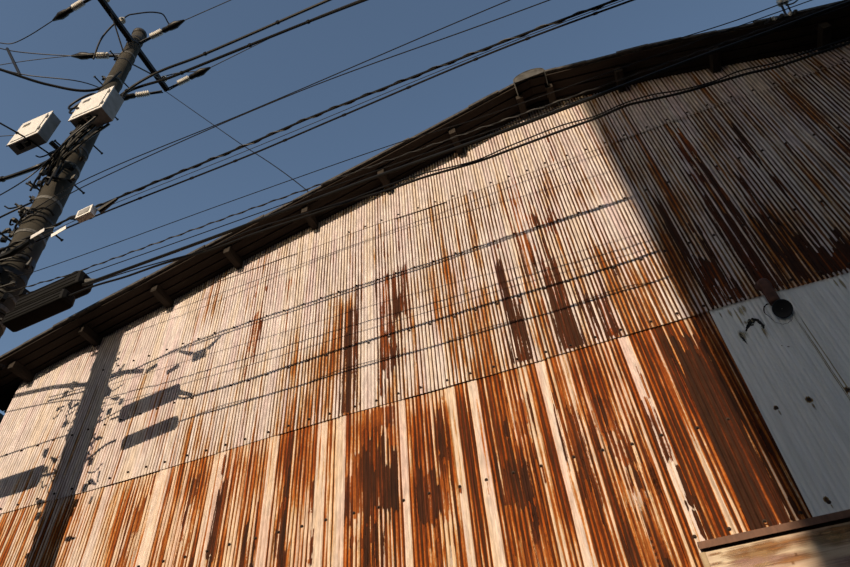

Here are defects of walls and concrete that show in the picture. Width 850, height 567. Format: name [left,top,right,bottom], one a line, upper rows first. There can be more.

corrosion [339,241,418,567]
corrosion [486,181,714,567]
corrosion [649,121,850,530]
corrosion [115,474,156,567]
corrosion [154,471,202,567]
corrosion [204,454,232,567]
corrosion [238,500,259,567]
corrosion [272,465,295,567]
corrosion [305,529,314,566]
corrosion [413,392,464,567]
corrosion [729,524,850,566]